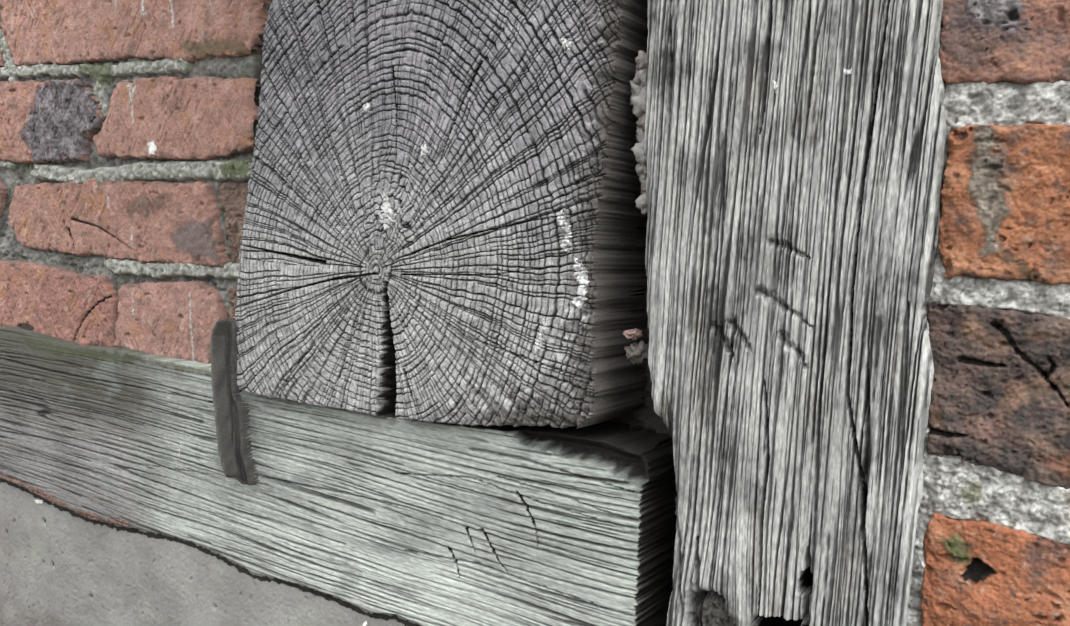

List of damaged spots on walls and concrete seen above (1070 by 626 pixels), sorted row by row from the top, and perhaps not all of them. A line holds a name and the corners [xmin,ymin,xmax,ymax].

crack [75,295,112,340]
crack [958,321,1067,403]